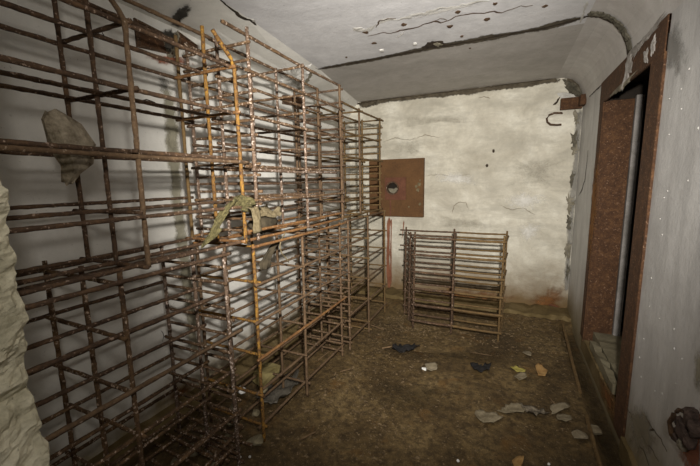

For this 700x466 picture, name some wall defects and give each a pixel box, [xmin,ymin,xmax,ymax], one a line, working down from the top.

water stain [163,5,191,52]
crack [220,0,257,26]
spalling [422,41,451,49]
crack [370,5,532,36]
peeling [587,11,665,97]
spalling [557,78,582,98]
flaking render [564,110,583,290]
rust [588,156,598,254]
rust [383,218,392,288]